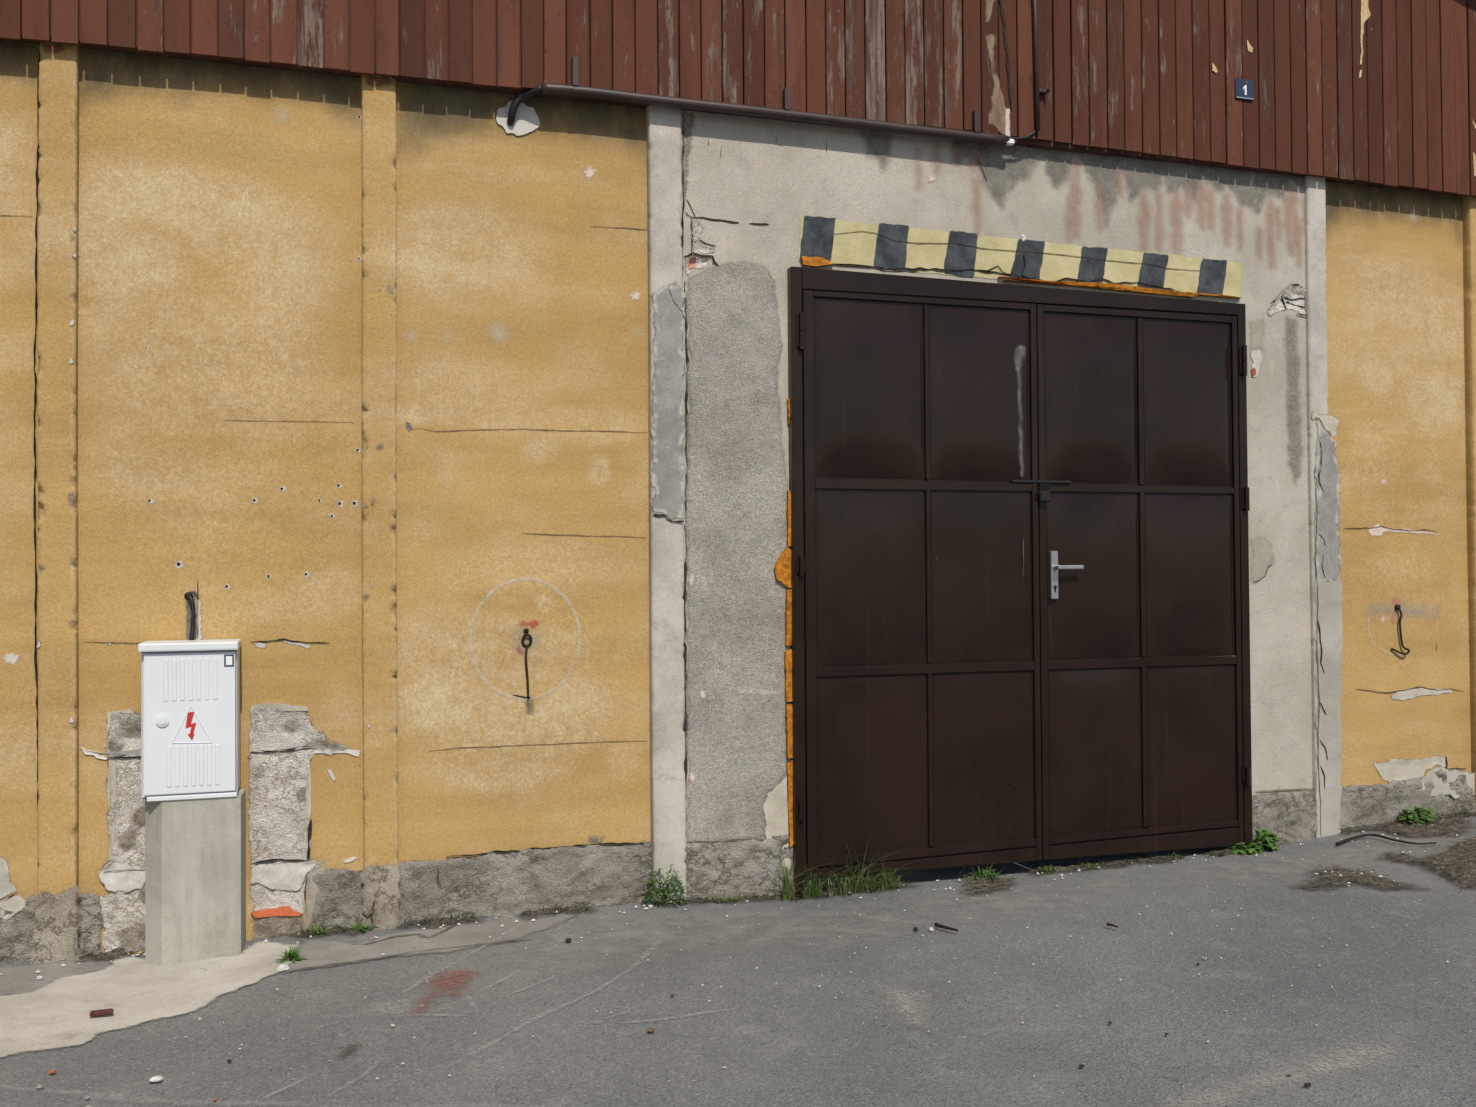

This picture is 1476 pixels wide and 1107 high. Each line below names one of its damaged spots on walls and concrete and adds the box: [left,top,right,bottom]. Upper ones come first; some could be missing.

leakage [955,140,1305,211]
leakage [1325,182,1456,217]
crack [406,422,626,432]
crack [524,115,769,843]
crack [430,741,629,751]
peeling [1373,756,1475,799]
spalling [80,709,145,954]
spalling [248,703,360,940]
peeling [0,857,26,920]